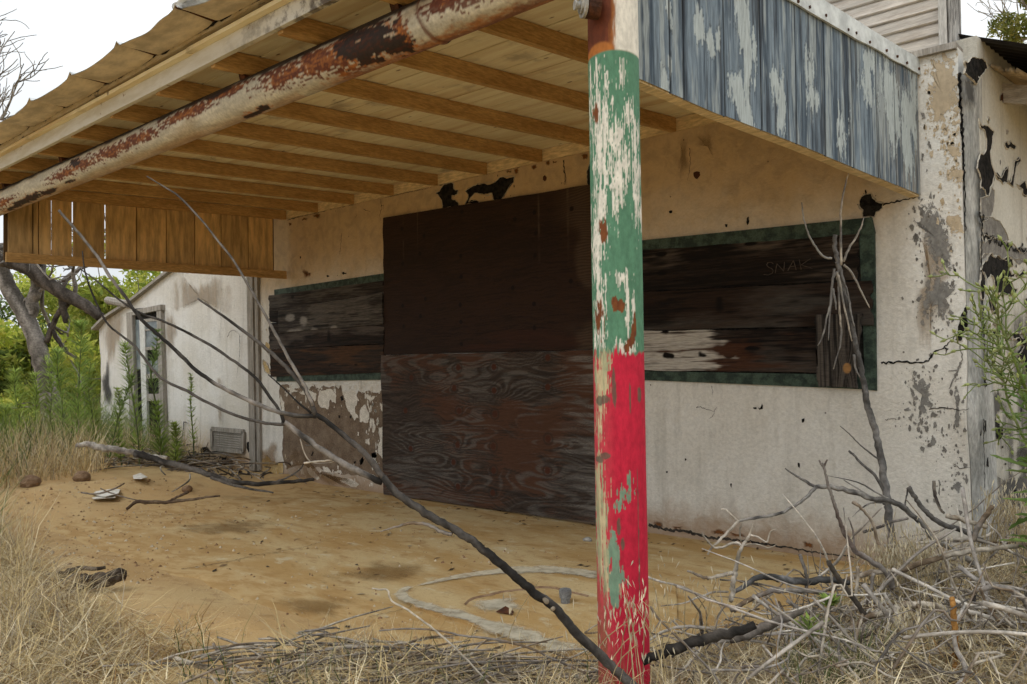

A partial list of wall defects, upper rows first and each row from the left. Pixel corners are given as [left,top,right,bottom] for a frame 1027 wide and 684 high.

peeling [259,381,383,487]
spalling [435,175,515,208]
crack [881,72,1027,488]
peeling [901,53,1027,374]